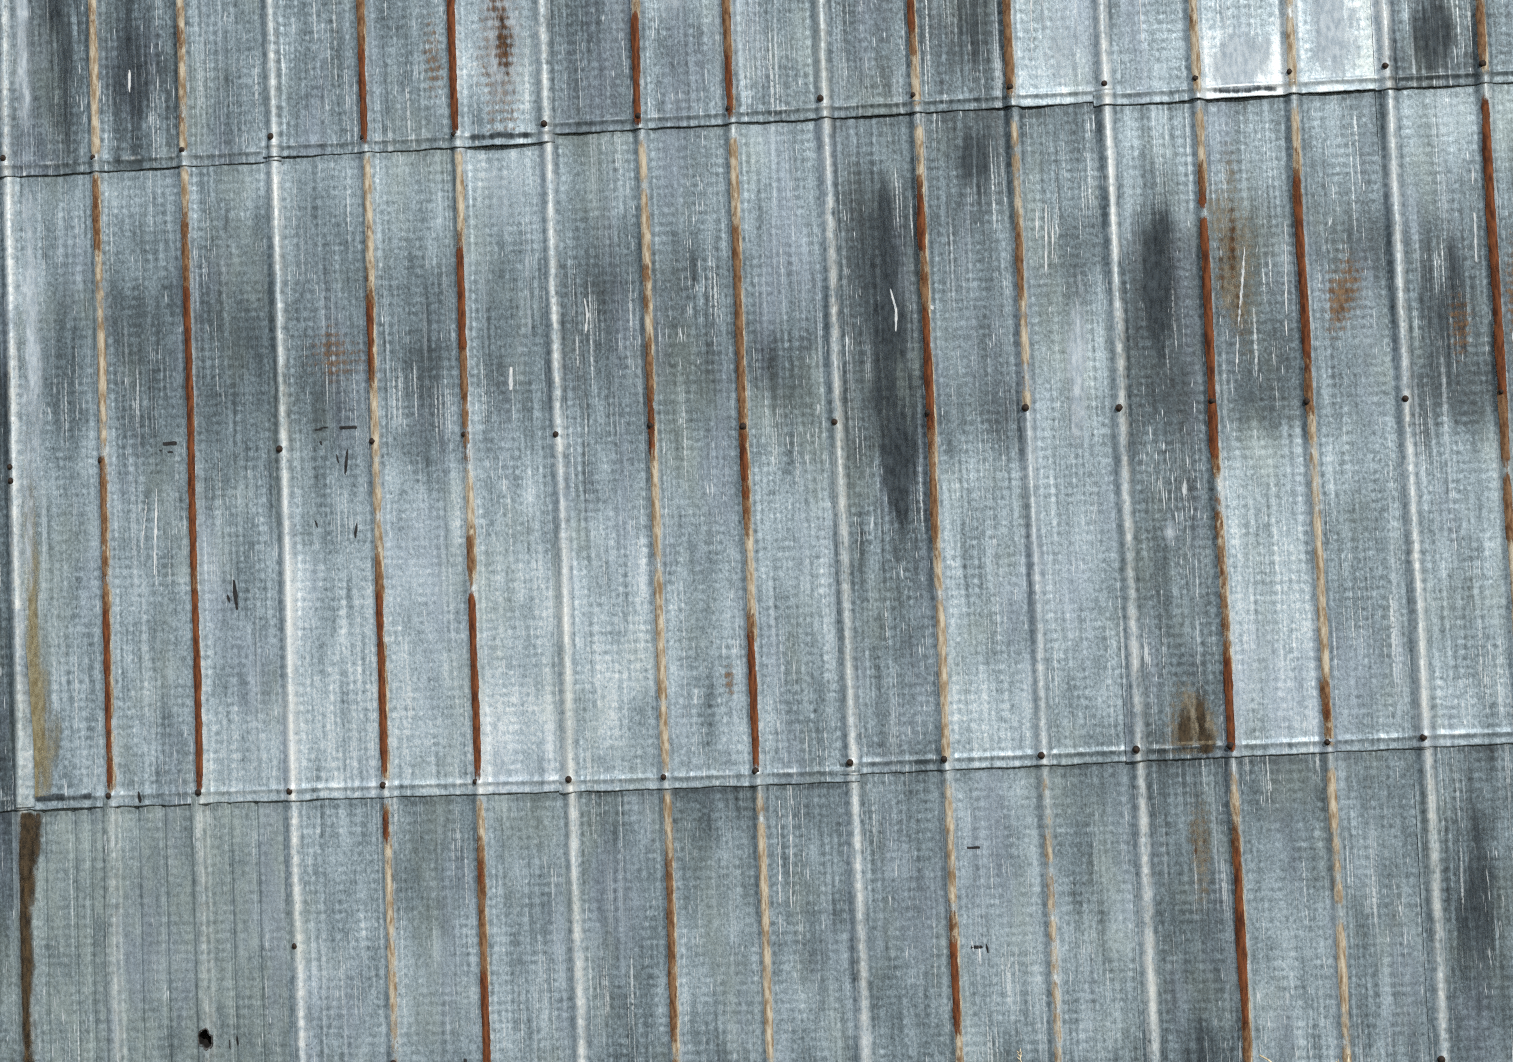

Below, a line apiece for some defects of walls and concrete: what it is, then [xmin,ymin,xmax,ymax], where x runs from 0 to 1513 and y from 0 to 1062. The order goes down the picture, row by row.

leakage [16,0,79,129]
rust [482,0,520,129]
leakage [869,189,916,526]
leakage [1143,211,1175,359]
rust [1172,0,1249,753]
rust [19,496,48,1062]
rust [1230,773,1253,1062]